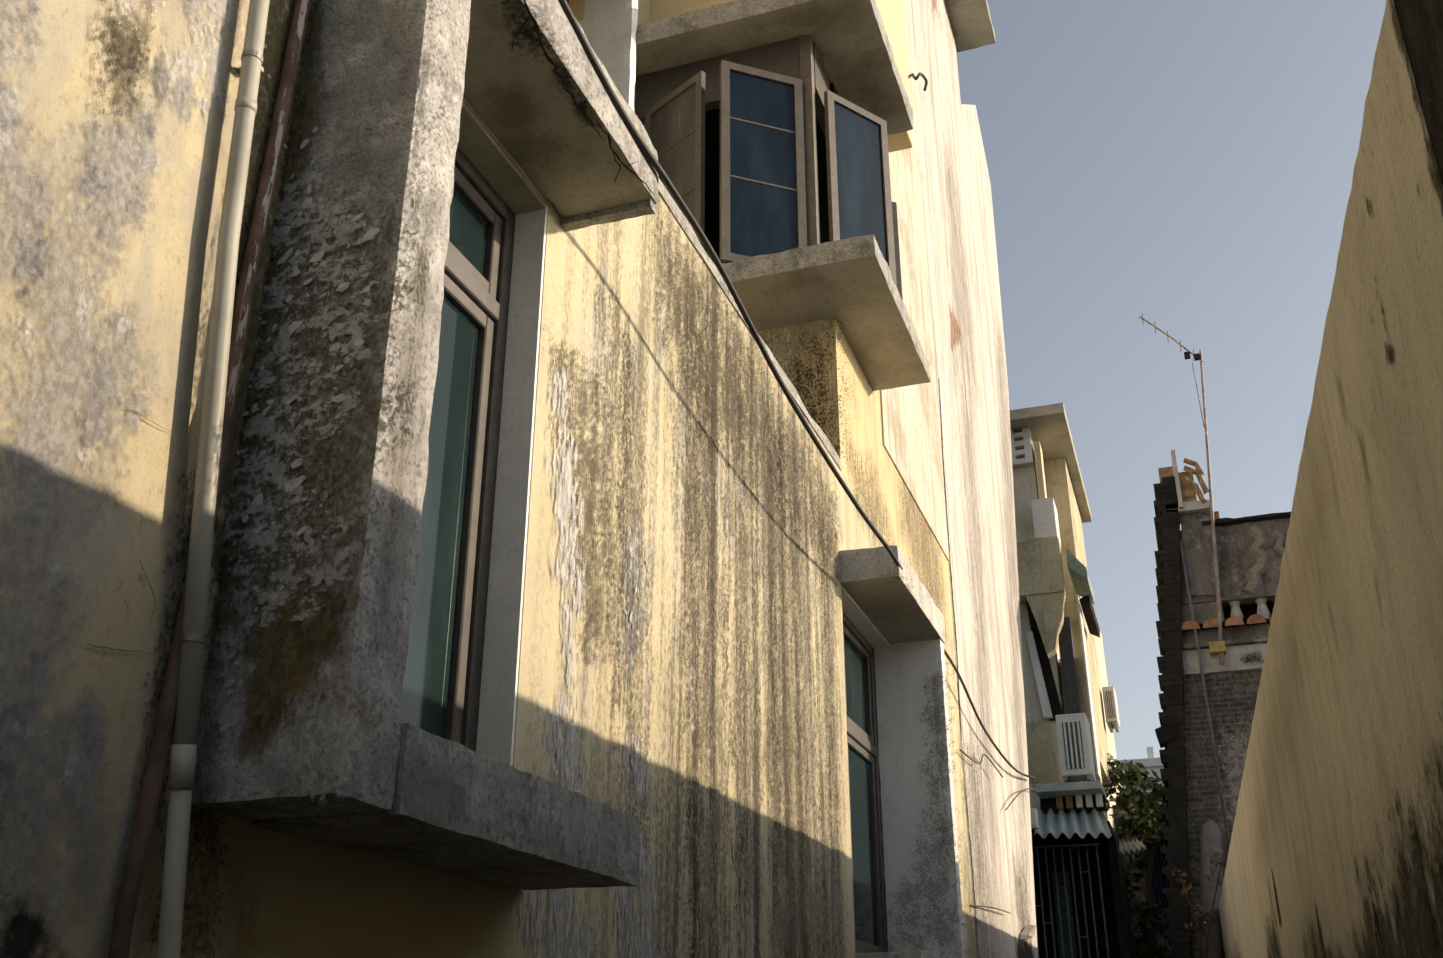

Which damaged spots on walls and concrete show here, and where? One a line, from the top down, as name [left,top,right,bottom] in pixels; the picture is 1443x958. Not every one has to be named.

leakage [87,0,166,133]
spalling [411,57,429,157]
peeling [215,127,424,738]
leakage [132,471,196,799]
leakage [543,281,657,858]
leakage [649,204,948,958]
leakage [256,666,379,798]
leakage [0,904,62,958]
leakage [1272,872,1282,928]